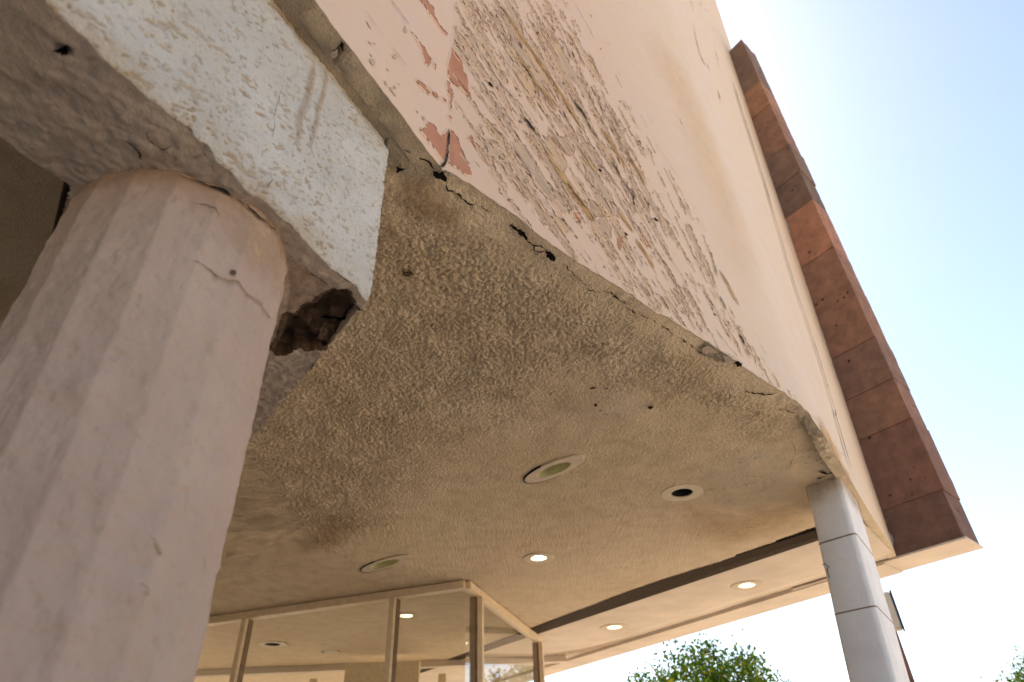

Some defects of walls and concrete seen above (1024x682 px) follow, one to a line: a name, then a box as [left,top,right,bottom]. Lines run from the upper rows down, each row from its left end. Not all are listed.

crack [127,131,171,172]
crack [176,174,328,285]
spalling [269,288,362,356]
crack [396,130,766,361]
peeling [404,0,792,399]
crack [483,6,739,307]